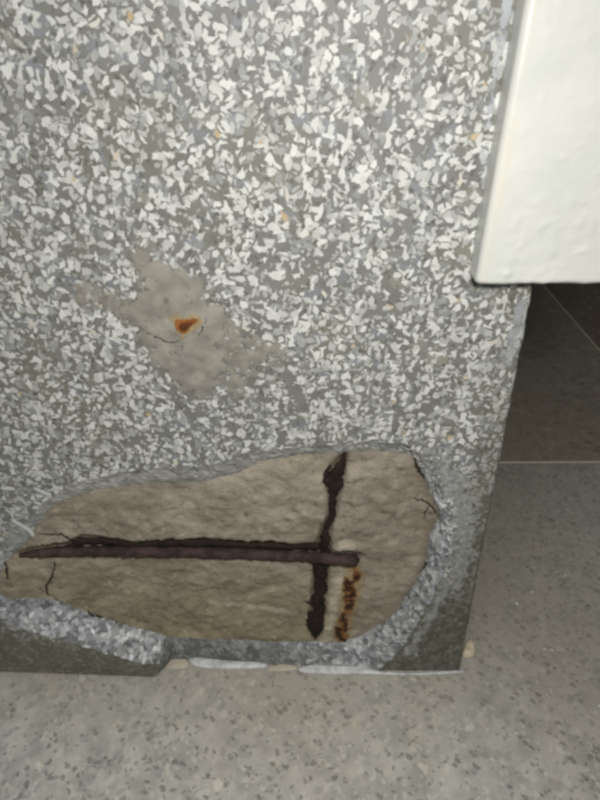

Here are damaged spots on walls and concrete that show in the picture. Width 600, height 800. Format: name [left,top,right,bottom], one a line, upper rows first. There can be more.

corrosion [169,314,202,339]
crack [411,497,439,517]
spalling [0,439,454,677]
crack [45,561,61,604]
corrosion [334,566,362,643]